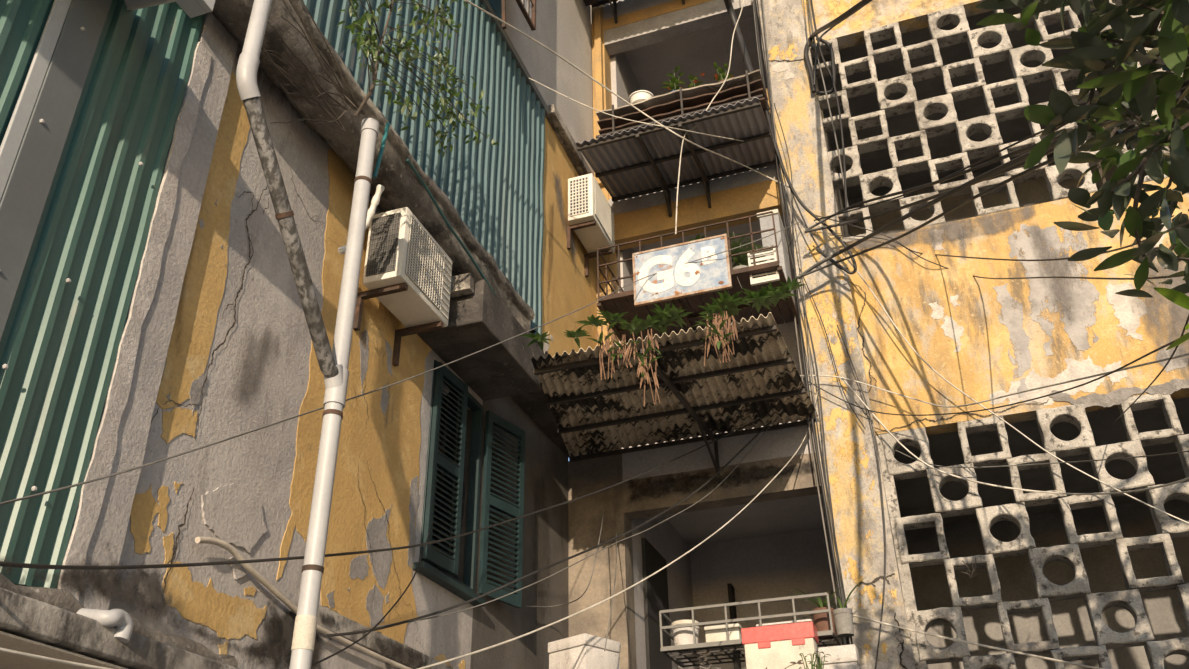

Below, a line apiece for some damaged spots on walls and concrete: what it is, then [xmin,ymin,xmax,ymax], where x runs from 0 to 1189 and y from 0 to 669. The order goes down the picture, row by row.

water stain [37,563,222,642]
crack [164,487,194,589]
peeling [126,481,267,654]
peeling [156,71,250,444]
crack [150,167,340,437]
water stain [240,334,270,398]
water stain [235,603,298,669]
peeling [276,343,325,580]
water stain [311,614,335,669]
peeling [321,149,356,350]
peeling [321,227,432,644]
peeling [986,224,1189,408]